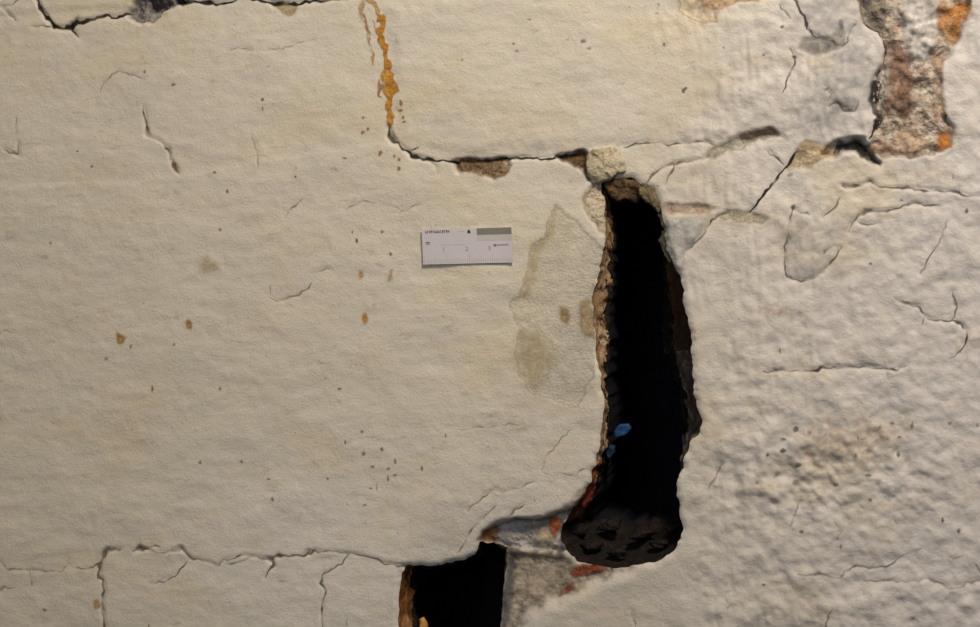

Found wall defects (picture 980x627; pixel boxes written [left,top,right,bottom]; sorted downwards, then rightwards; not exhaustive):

crack [14,0,133,36]
crack [181,0,331,8]
spalling [679,0,758,23]
corrosion [359,0,406,127]
crack [780,0,887,139]
spalling [788,0,971,169]
crack [388,127,574,164]
crack [624,140,699,177]
crack [784,180,966,282]
spalling [398,149,769,627]
crack [77,545,160,627]
crack [264,549,402,613]